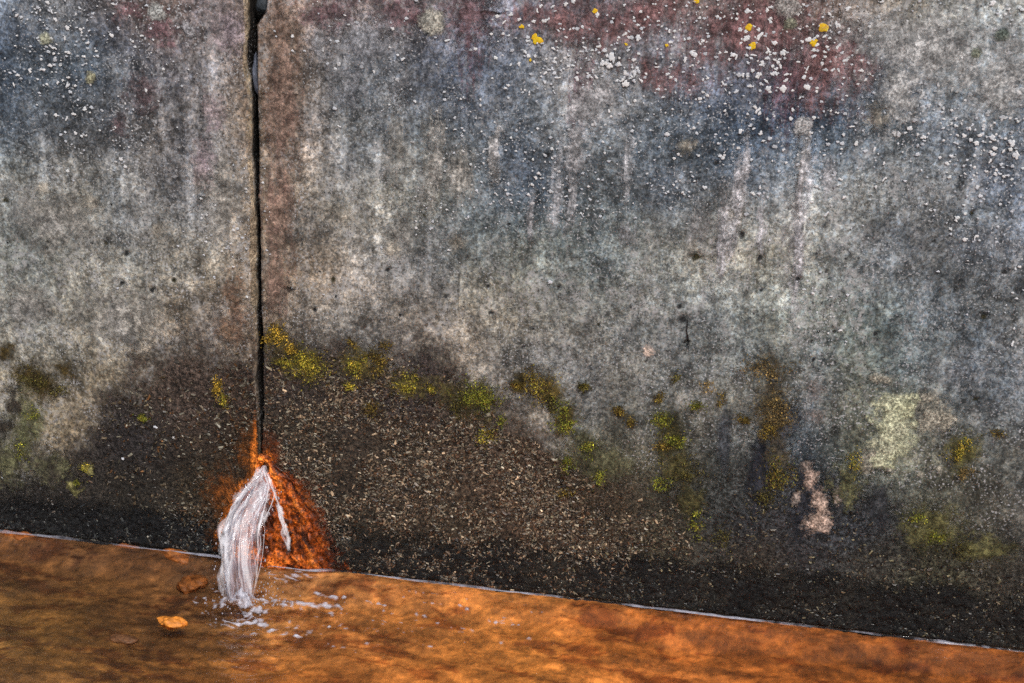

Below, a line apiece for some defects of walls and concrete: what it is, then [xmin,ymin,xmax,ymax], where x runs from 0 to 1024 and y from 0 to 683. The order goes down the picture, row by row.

leakage [510,0,1024,141]
leakage [7,182,105,257]
leakage [191,90,246,238]
leakage [386,120,473,211]
leakage [488,128,500,181]
leakage [547,64,615,225]
leakage [624,142,633,191]
leakage [685,135,750,273]
leakage [781,133,832,314]
corrosion [206,421,349,572]
leakage [0,284,1024,610]